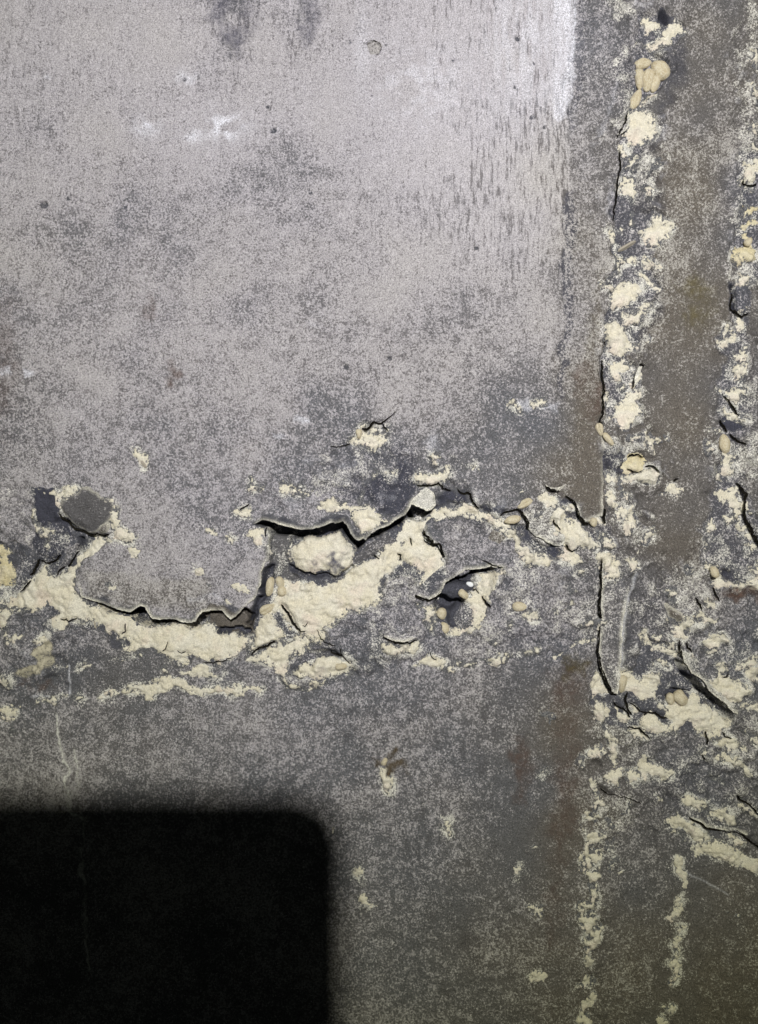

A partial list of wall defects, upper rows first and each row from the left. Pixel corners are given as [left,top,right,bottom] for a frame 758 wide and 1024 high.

crack [613,112,628,220]
crack [598,341,606,424]
peeling [0,476,564,672]
water stain [698,729,758,784]
crack [690,795,758,848]
water stain [525,904,544,918]
water stain [575,723,632,1024]
water stain [664,795,758,986]
water stain [528,969,548,982]
water stain [656,1003,676,1024]